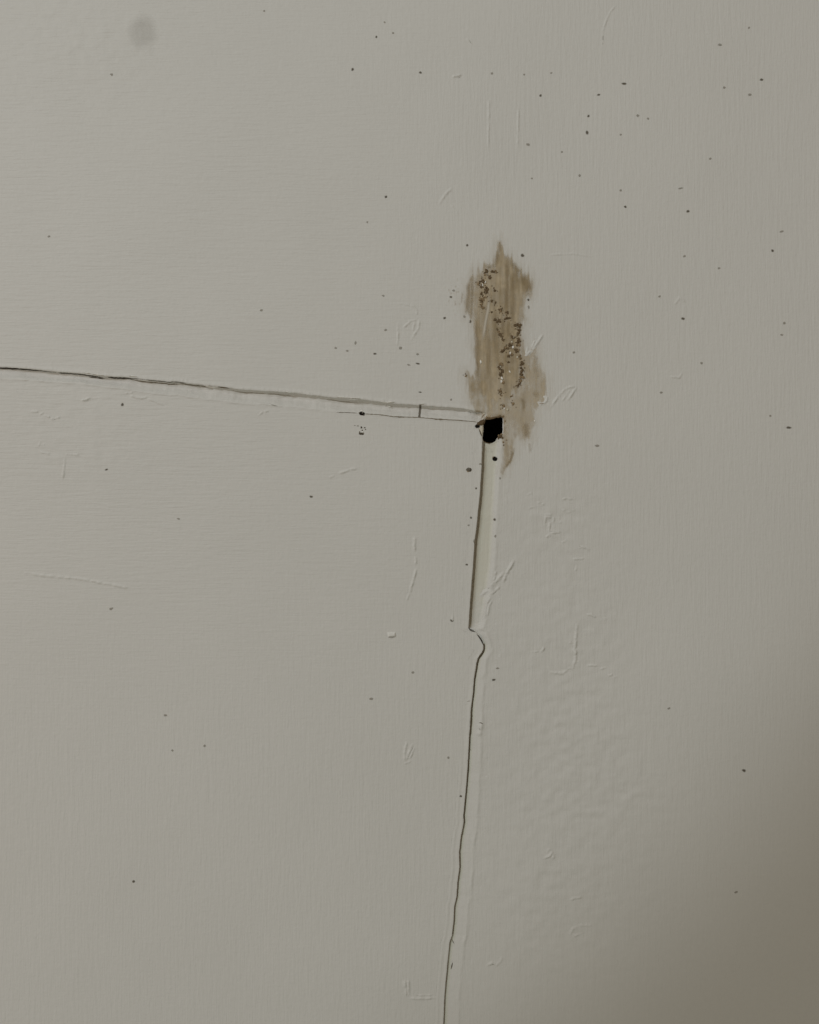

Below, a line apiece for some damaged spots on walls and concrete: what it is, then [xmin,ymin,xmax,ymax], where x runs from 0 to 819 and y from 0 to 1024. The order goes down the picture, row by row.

spalling [479,417,503,443]
damp [465,243,549,466]
crack [0,358,511,1024]